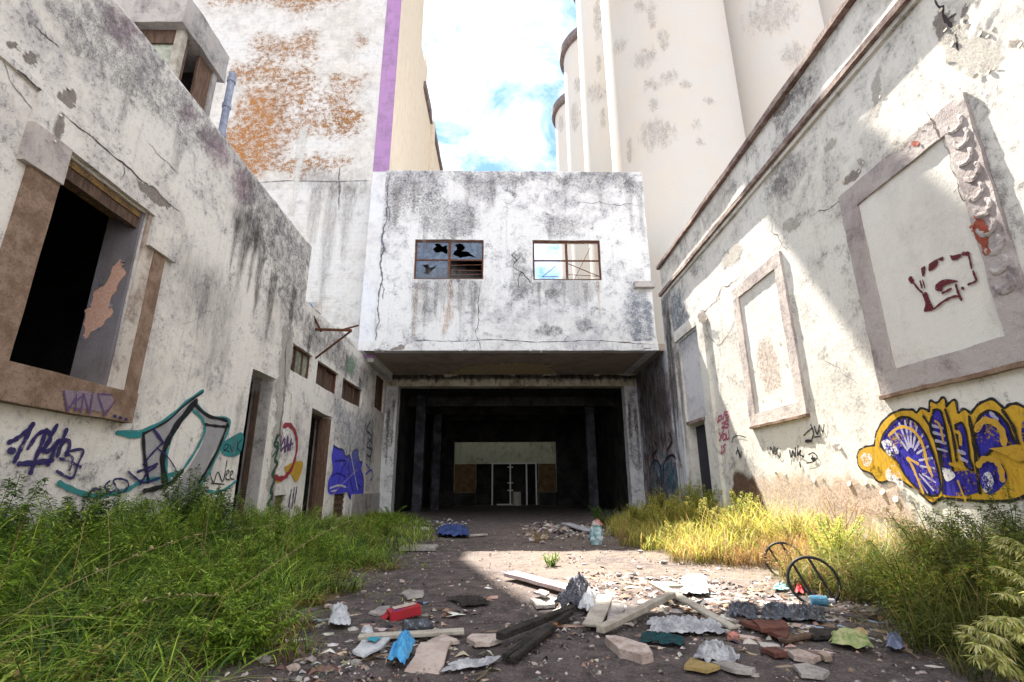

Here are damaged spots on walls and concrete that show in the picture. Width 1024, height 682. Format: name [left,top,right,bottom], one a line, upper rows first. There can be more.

rust [225,0,337,13]
crack [3,61,42,108]
spalling [54,87,77,142]
rust [226,30,367,176]
crack [61,111,179,211]
peeling [80,259,126,339]
water stain [231,127,368,394]
crack [260,167,432,343]
crack [472,288,653,351]
water stain [730,471,767,520]